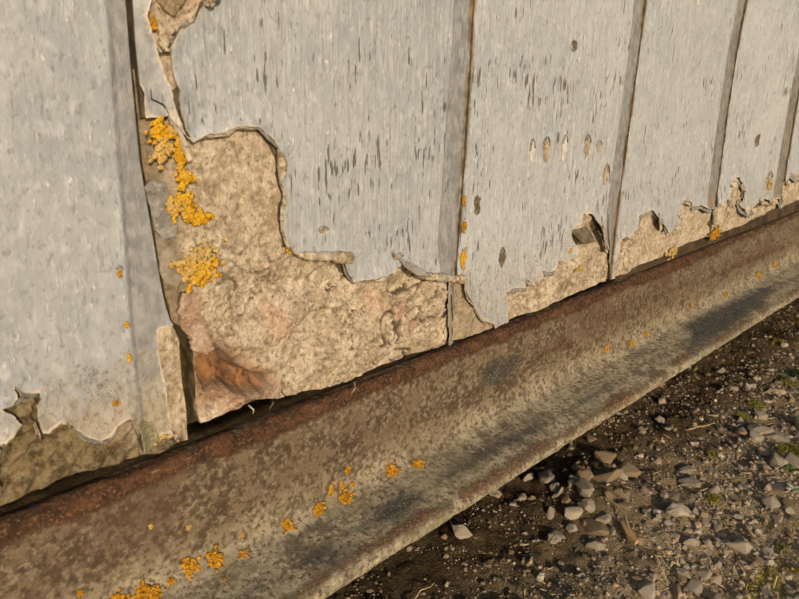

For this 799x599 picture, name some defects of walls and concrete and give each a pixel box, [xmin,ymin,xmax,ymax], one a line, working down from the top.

peeling [148,0,216,90]
peeling [529,136,551,163]
peeling [585,132,602,156]
peeling [0,69,493,506]
peeling [506,171,799,320]
corrosion [0,211,799,547]
corrosion [282,503,454,599]